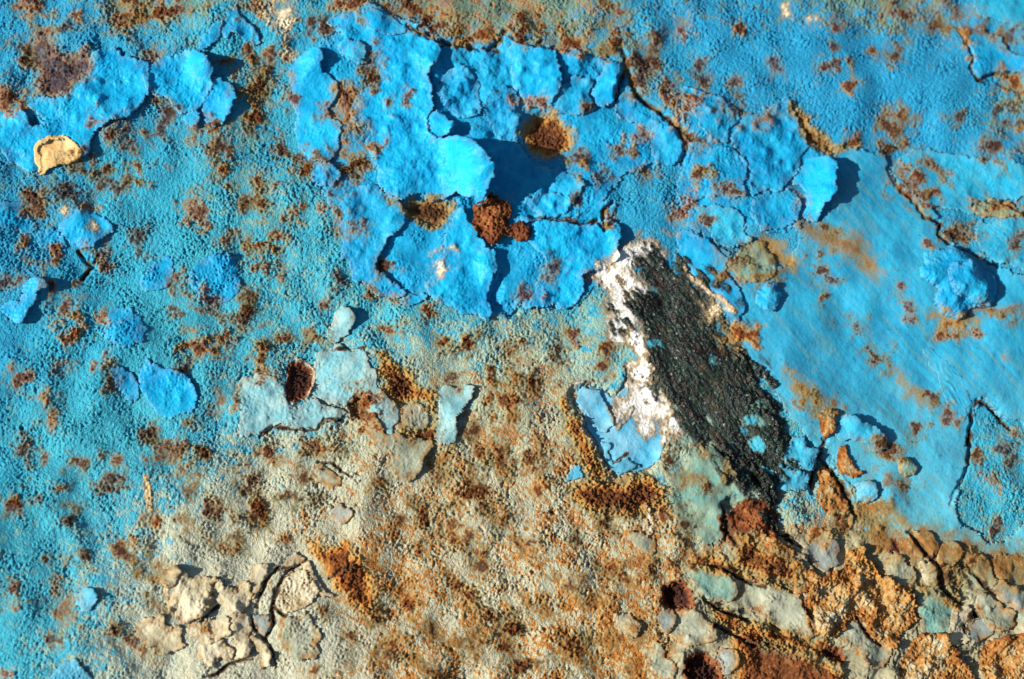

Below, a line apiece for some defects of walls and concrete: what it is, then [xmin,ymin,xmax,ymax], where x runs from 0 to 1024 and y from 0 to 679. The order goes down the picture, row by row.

peeling [0,6,260,175]
corrosion [174,0,368,234]
corrosion [382,0,716,151]
peeling [237,305,475,483]
water stain [615,405,635,431]
corrosion [275,315,1024,679]
peeling [288,0,1024,646]
water stain [683,266,737,314]
water stain [715,350,792,532]
crack [887,170,996,267]
crack [973,200,1024,217]
crack [202,559,307,677]